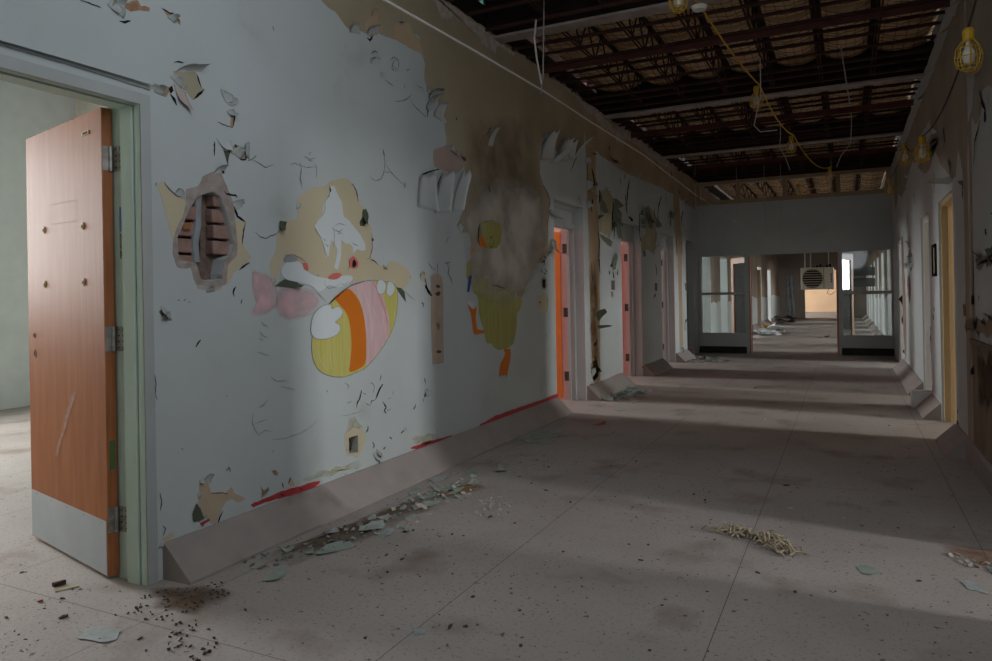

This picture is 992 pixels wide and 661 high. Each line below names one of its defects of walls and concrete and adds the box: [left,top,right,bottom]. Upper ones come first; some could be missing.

peeling [80,0,150,23]
peeling [162,8,181,25]
peeling [152,61,210,111]
peeling [219,109,239,128]
peeling [156,138,411,293]
flaking render [321,0,721,383]
flaking render [883,0,992,339]
spalling [159,305,172,321]
flaking render [710,254,780,303]
flaking render [866,236,914,362]
peeling [192,473,246,526]